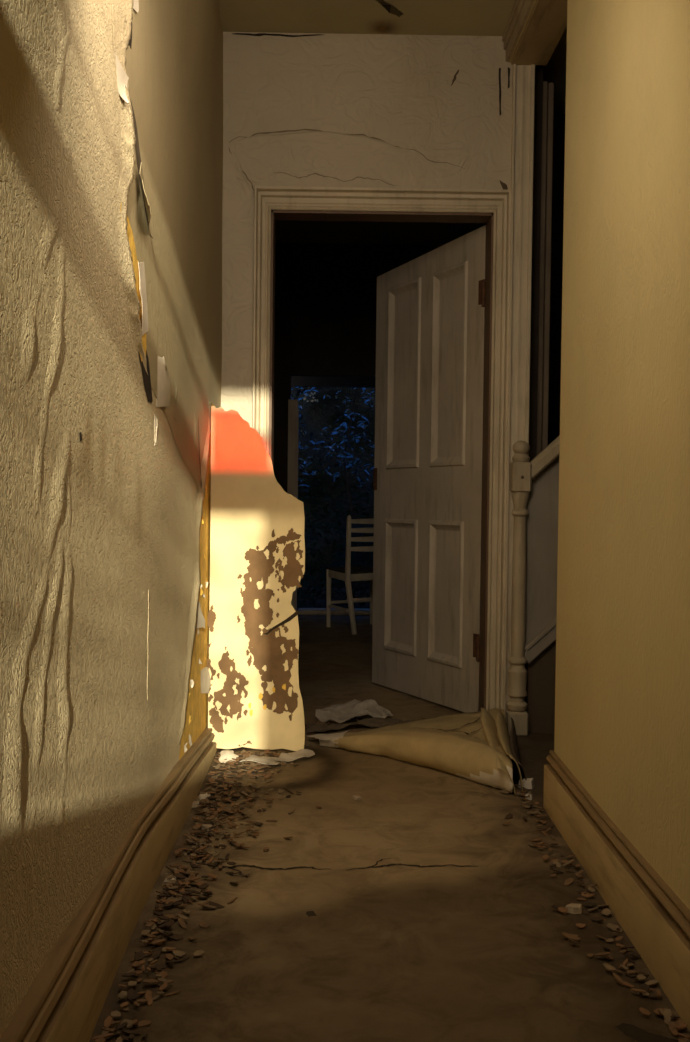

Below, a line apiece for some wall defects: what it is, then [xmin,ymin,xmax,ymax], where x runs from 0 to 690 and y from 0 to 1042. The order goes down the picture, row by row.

flaking render [120,202,147,362]
flaking render [179,433,304,760]
crack [182,858,478,878]